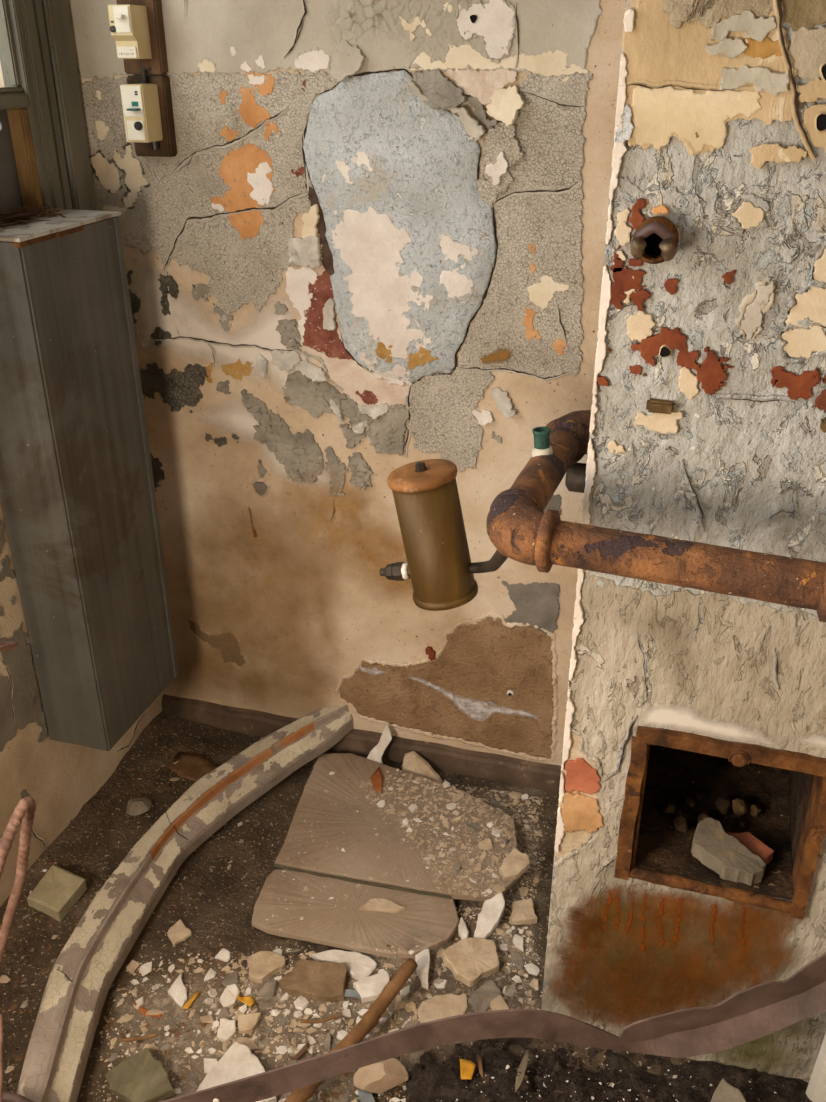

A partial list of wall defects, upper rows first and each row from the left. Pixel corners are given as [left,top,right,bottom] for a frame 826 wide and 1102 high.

crack [283,0,488,58]
crack [514,3,585,107]
crack [617,79,756,92]
crack [773,0,816,160]
crack [164,108,309,276]
peeling [67,0,826,562]
peeling [0,521,15,582]
peeling [0,622,48,752]
peeling [334,569,826,1037]
rust [555,885,787,1020]
peeling [686,1010,826,1083]